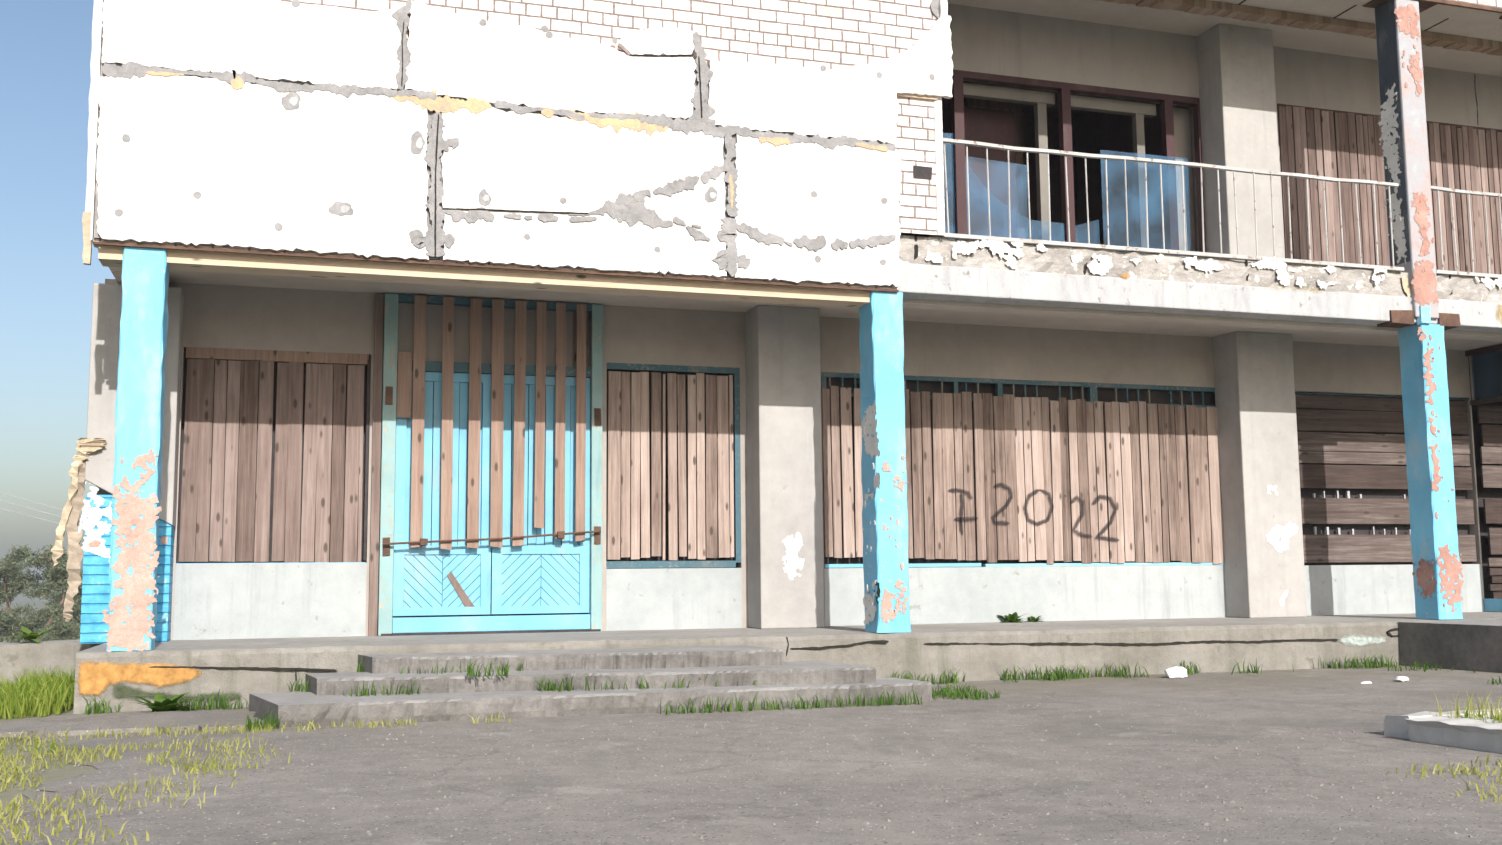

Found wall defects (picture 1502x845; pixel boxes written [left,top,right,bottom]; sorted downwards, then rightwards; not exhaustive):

peeling [1372,3,1439,306]
spalling [328,201,354,216]
peeling [925,239,1048,271]
peeling [1071,253,1164,275]
peeling [1182,256,1224,272]
peeling [1251,256,1336,289]
peeling [1475,276,1502,298]
peeling [1418,327,1455,519]
peeling [862,401,909,625]
peeling [78,449,169,652]
spalling [782,532,804,580]
peeling [1412,544,1464,613]